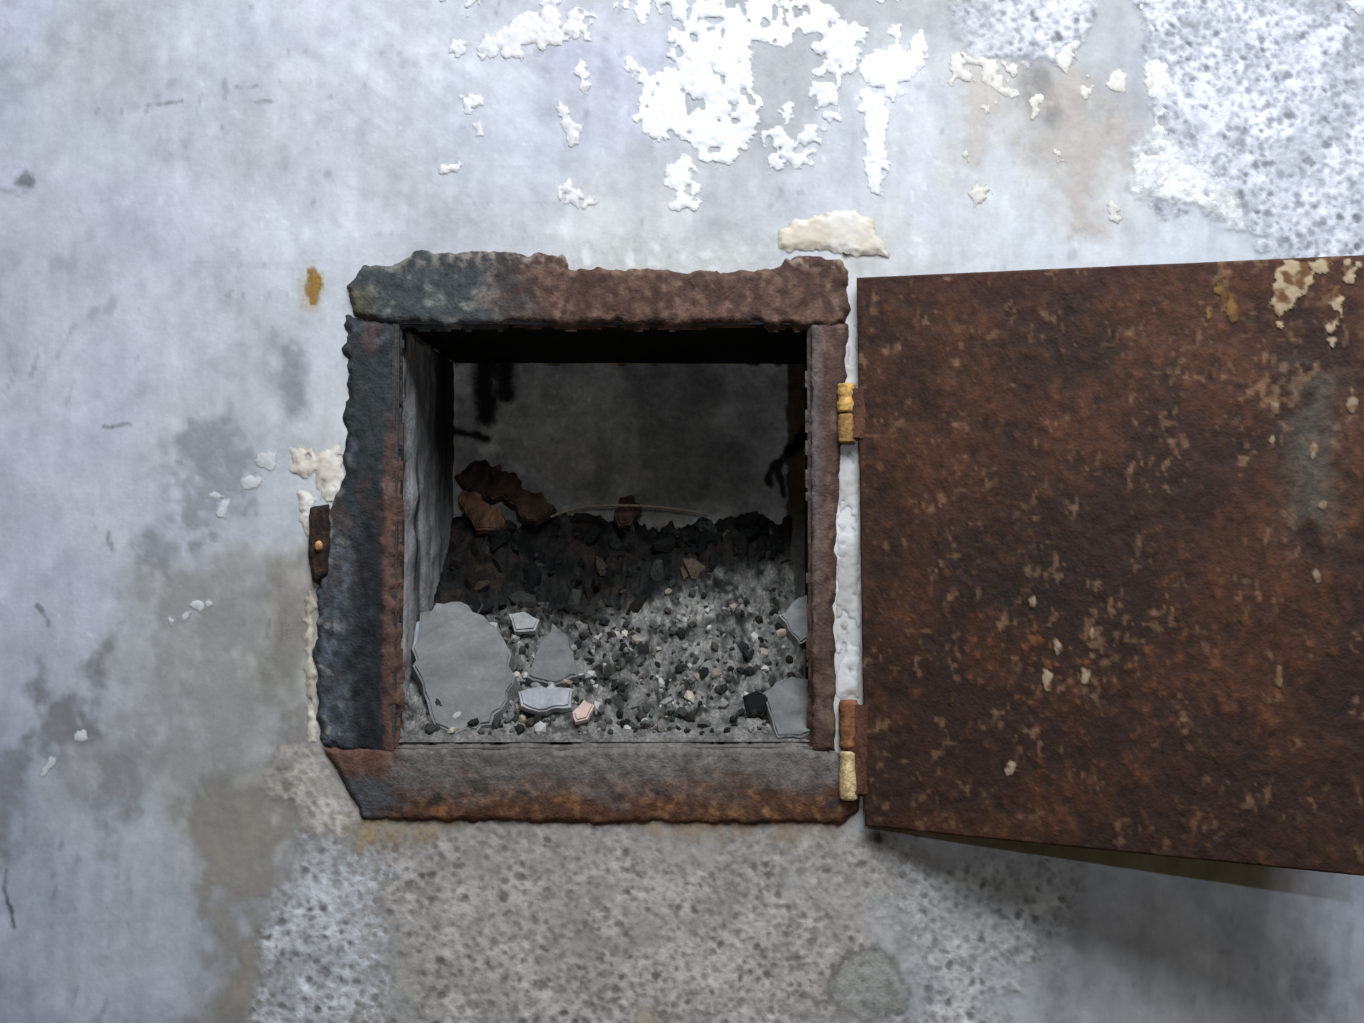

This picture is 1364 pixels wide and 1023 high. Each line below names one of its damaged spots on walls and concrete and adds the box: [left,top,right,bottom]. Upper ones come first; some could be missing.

peeling [449,0,596,61]
peeling [573,59,591,94]
peeling [459,94,484,136]
peeling [557,98,583,147]
peeling [613,0,928,211]
peeling [438,160,462,174]
water stain [1030,71,1123,233]
peeling [557,178,597,209]
peeling [778,210,889,258]